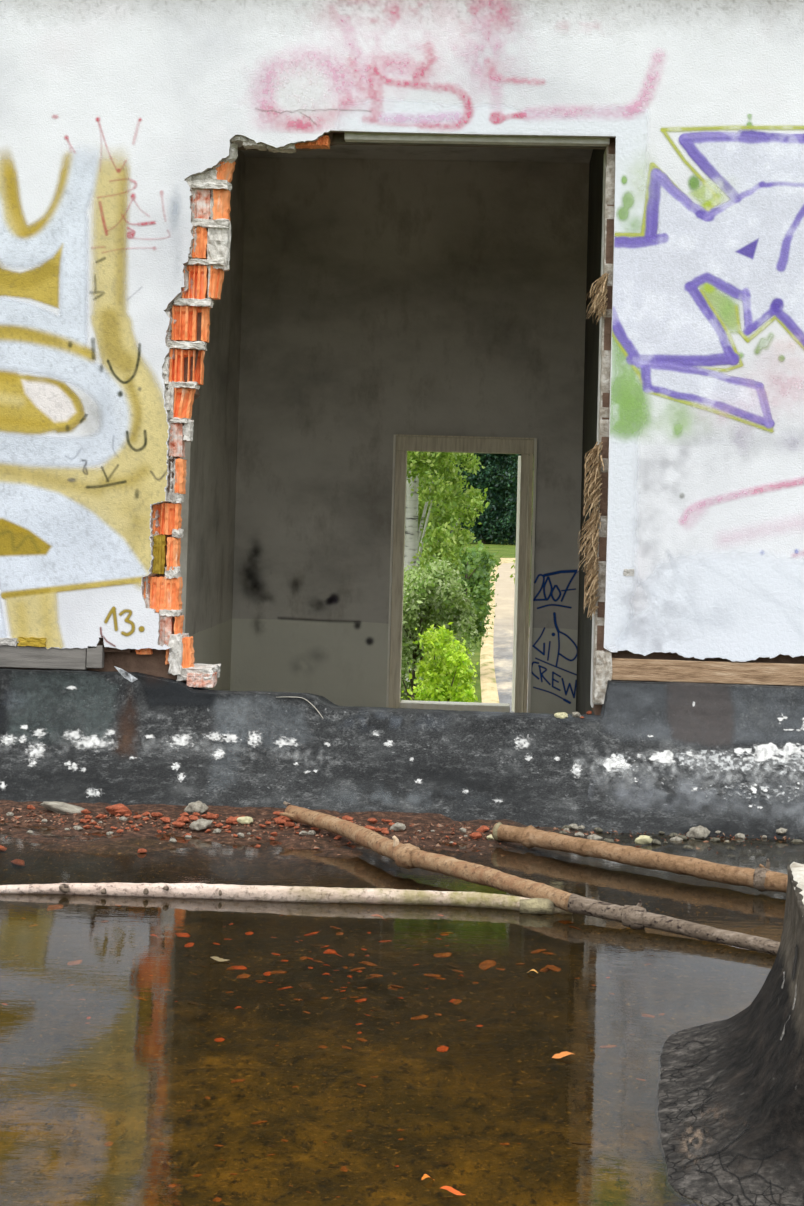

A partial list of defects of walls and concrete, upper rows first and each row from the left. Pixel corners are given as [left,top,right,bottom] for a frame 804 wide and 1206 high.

spalling [231,135,330,153]
spalling [135,161,236,688]
water stain [618,763,772,804]
crack [683,1040,719,1116]
crack [686,1129,789,1206]